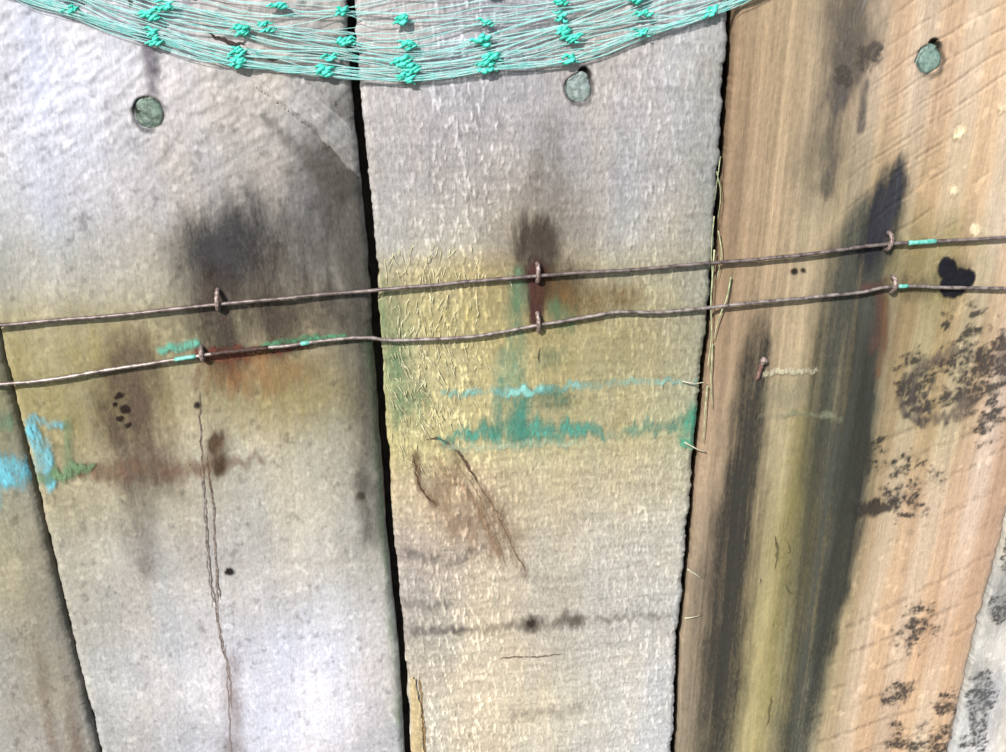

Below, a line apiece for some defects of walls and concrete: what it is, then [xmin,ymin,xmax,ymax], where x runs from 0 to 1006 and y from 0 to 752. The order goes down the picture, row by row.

leakage [827,0,883,131]
leakage [186,198,333,378]
leakage [516,216,567,298]
corrosion [527,263,579,328]
corrosion [195,338,314,390]
leakage [893,304,1006,448]
crack [198,395,232,752]
crack [412,437,526,572]
leakage [699,330,771,752]
leakage [777,157,927,752]
leakage [897,606,936,655]
leakage [887,670,998,752]